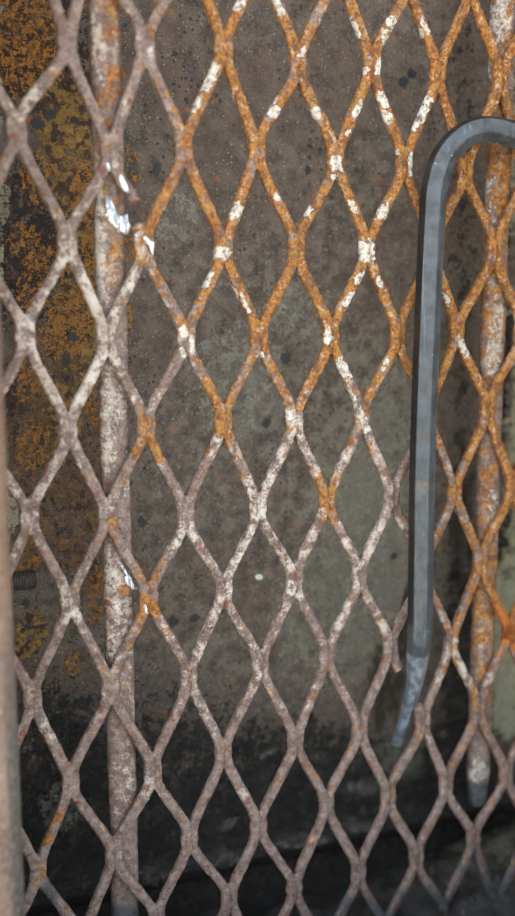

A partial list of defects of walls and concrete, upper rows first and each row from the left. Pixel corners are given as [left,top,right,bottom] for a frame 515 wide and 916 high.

rust [0,0,58,109]
rust [61,0,71,18]
rust [77,0,91,89]
rust [26,66,93,221]
rust [0,161,100,535]
rust [17,450,103,623]
rust [14,607,50,661]